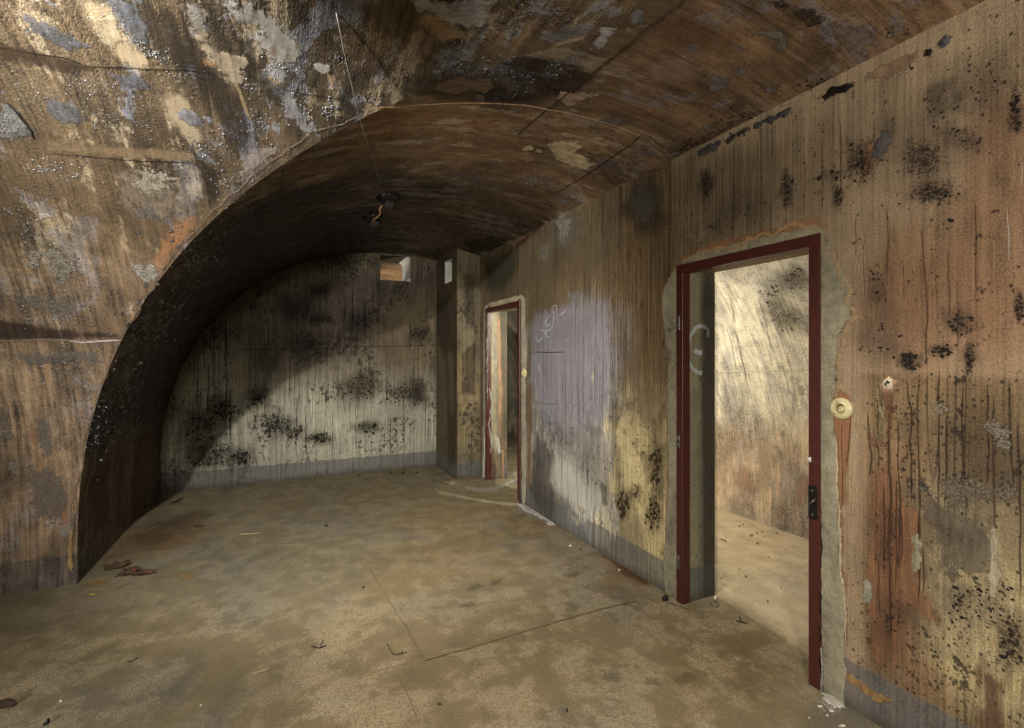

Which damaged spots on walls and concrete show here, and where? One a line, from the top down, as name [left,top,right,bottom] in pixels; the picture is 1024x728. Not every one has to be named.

spalling [0,103,35,140]
peeling [520,132,617,170]
leakage [816,127,893,207]
mould [902,138,960,206]
mould [928,90,982,147]
mould [961,55,1022,131]
leakage [0,0,497,546]
mould [614,441,664,531]
flaking render [661,220,858,716]
corrosion [831,391,851,553]
corrosion [869,466,941,668]